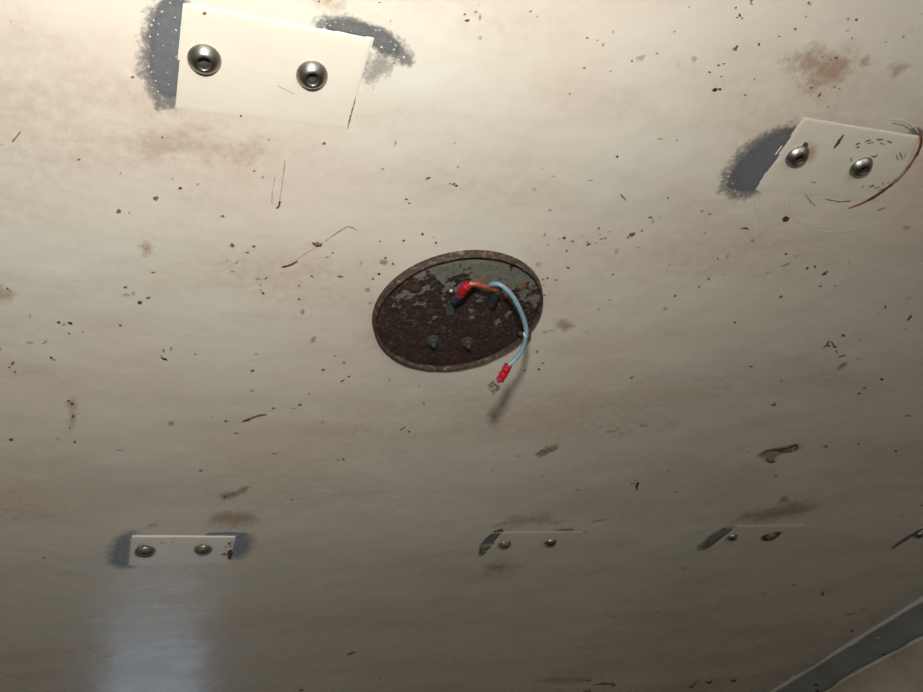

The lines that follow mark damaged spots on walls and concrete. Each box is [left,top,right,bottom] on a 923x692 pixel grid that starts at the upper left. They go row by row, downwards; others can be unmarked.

peeling [137,0,187,110]
peeling [316,16,413,66]
peeling [719,126,796,199]